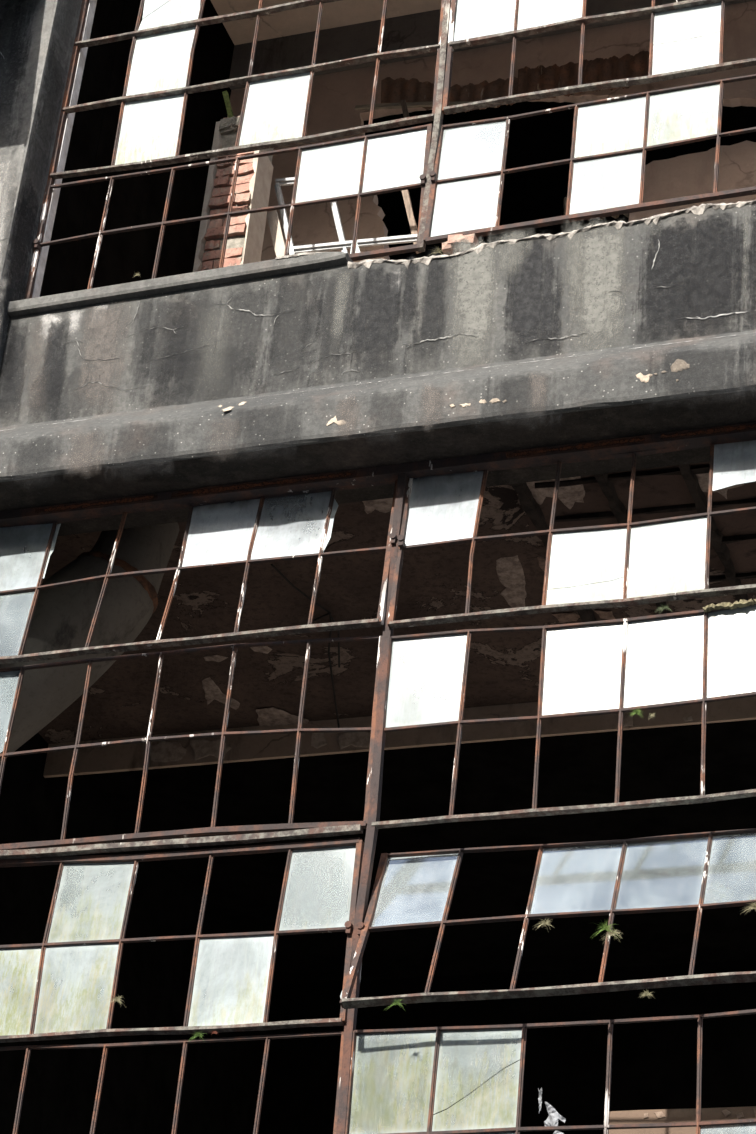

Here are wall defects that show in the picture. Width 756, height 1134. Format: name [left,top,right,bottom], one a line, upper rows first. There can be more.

spalling [347,200,756,269]
leakage [0,163,126,411]
crack [216,297,296,324]
leakage [316,222,624,372]
leakage [638,210,756,339]
crack [677,310,756,319]
spalling [636,359,690,382]